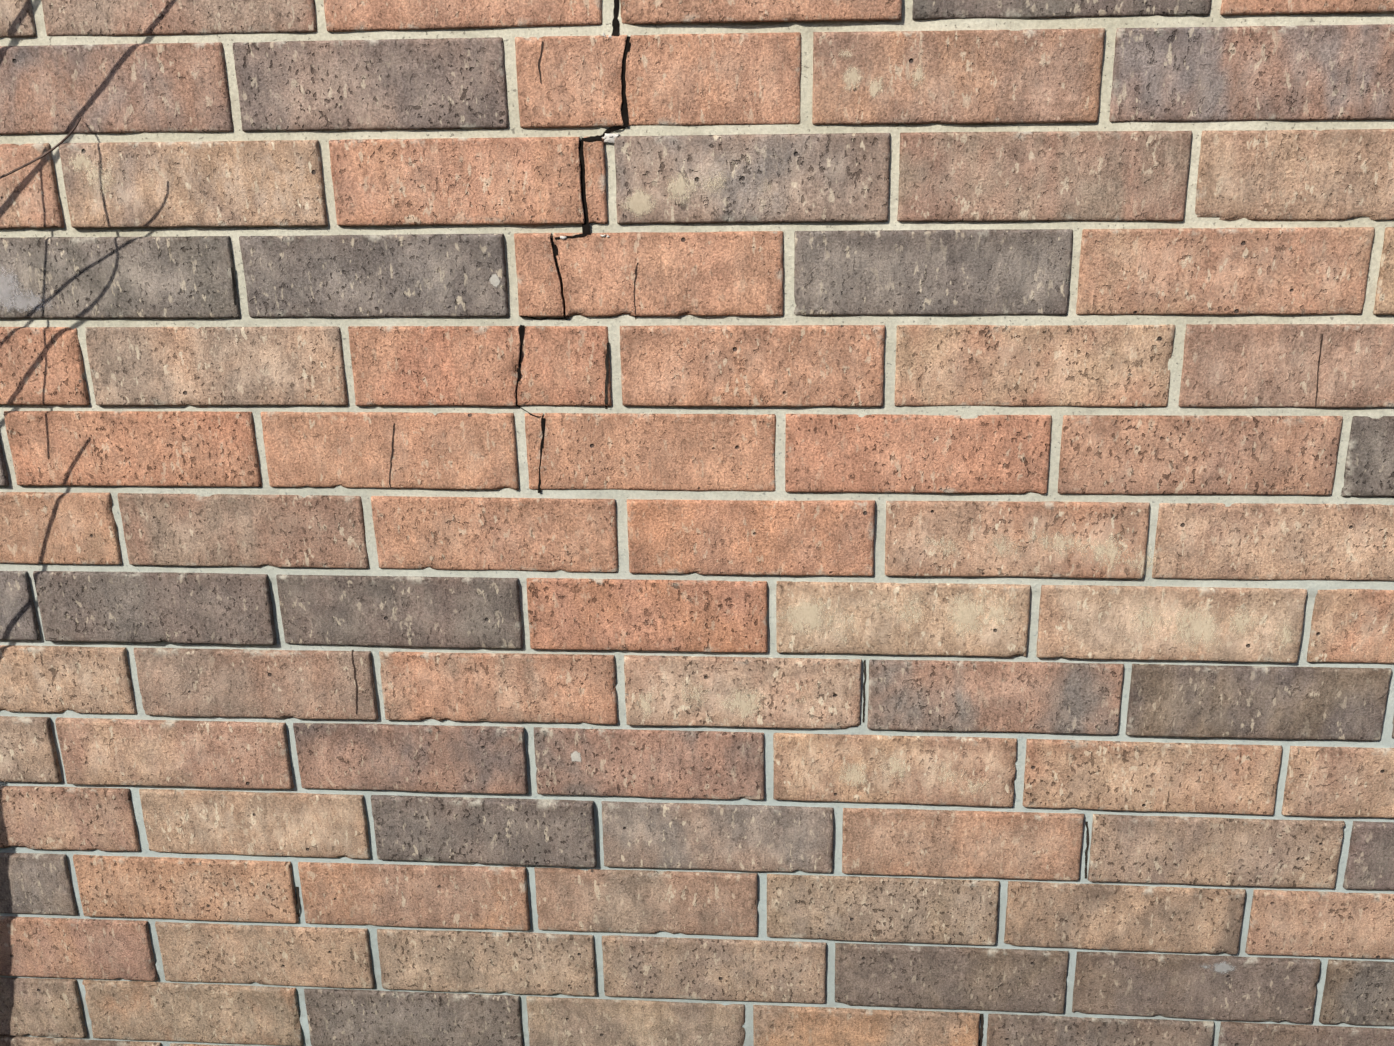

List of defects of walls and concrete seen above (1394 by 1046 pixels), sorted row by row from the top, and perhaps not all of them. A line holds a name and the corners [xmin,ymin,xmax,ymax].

crack [516,0,631,493]
crack [631,263,639,319]